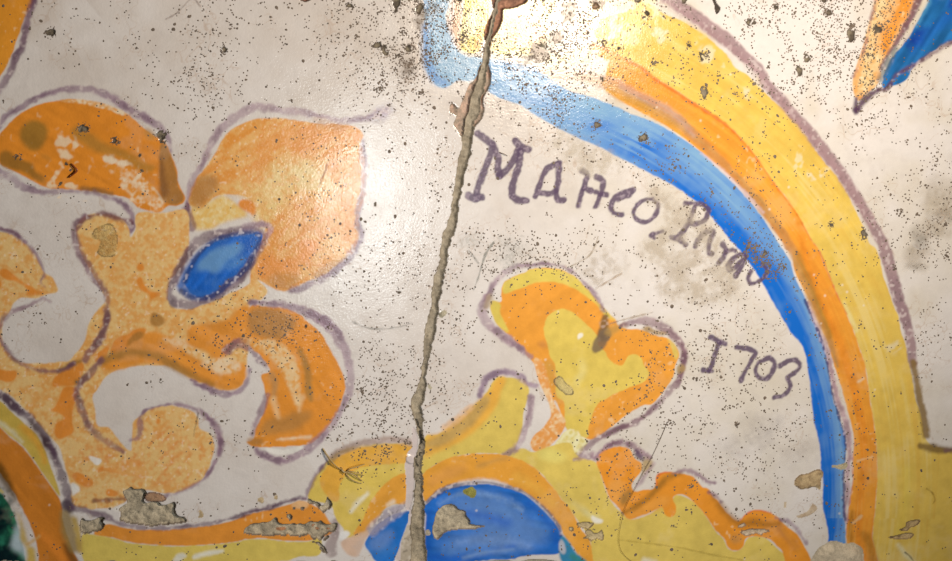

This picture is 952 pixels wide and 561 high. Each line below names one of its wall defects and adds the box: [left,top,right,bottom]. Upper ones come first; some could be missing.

crack [410,0,501,561]